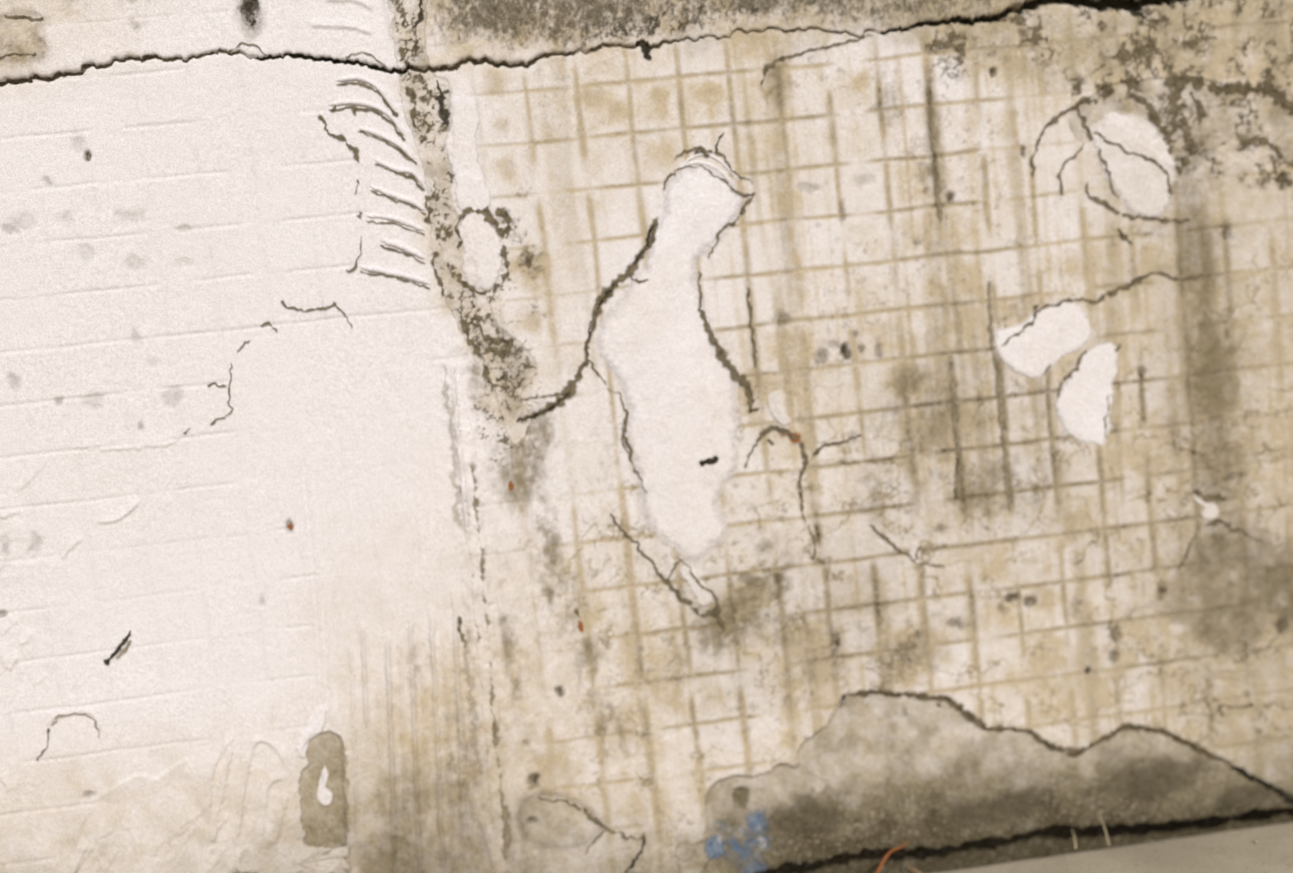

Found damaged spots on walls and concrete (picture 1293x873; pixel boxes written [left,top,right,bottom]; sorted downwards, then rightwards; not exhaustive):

damp [240,0,259,26]
crack [0,0,1188,86]
damp [441,0,955,47]
crack [1030,96,1190,244]
spalling [1065,0,1293,196]
crack [516,133,861,560]
spalling [699,456,719,467]
crack [988,271,1202,509]
spalling [236,706,349,873]
peeling [518,793,602,850]
spalling [702,693,1293,873]
crack [838,689,1293,805]